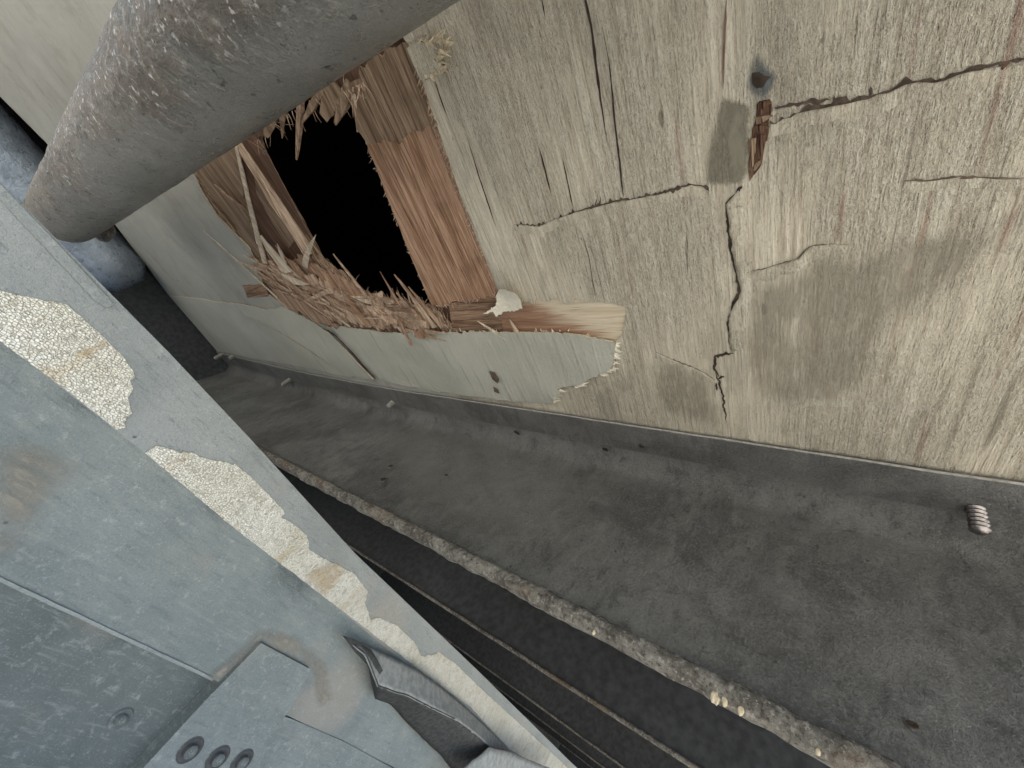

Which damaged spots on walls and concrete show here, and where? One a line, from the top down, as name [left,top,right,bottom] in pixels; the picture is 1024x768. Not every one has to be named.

spalling [191,28,627,346]
crack [513,183,849,423]
crack [768,57,1024,137]
crack [902,175,1024,193]